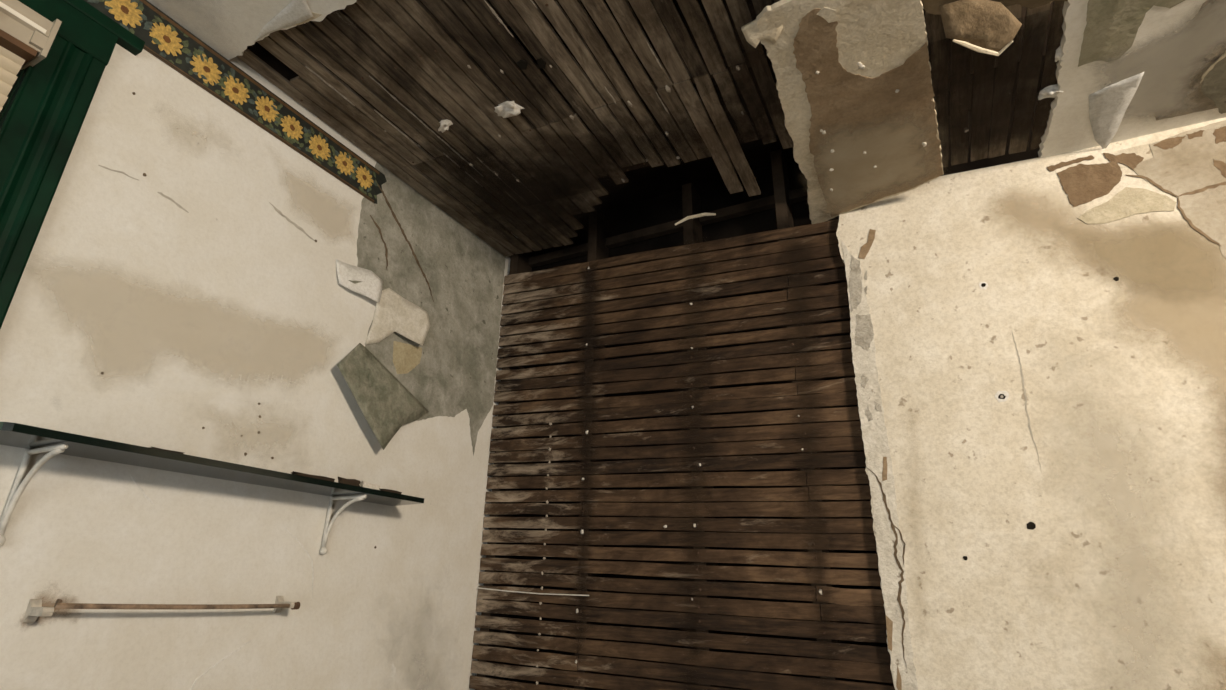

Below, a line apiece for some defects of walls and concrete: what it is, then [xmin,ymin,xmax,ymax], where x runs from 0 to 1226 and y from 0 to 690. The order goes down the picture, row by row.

peeling [816,7,840,23]
peeling [1047,0,1226,259]
water stain [49,269,326,378]
peeling [357,162,506,456]
water stain [1003,200,1226,397]
peeling [842,229,918,690]
crack [865,466,907,668]